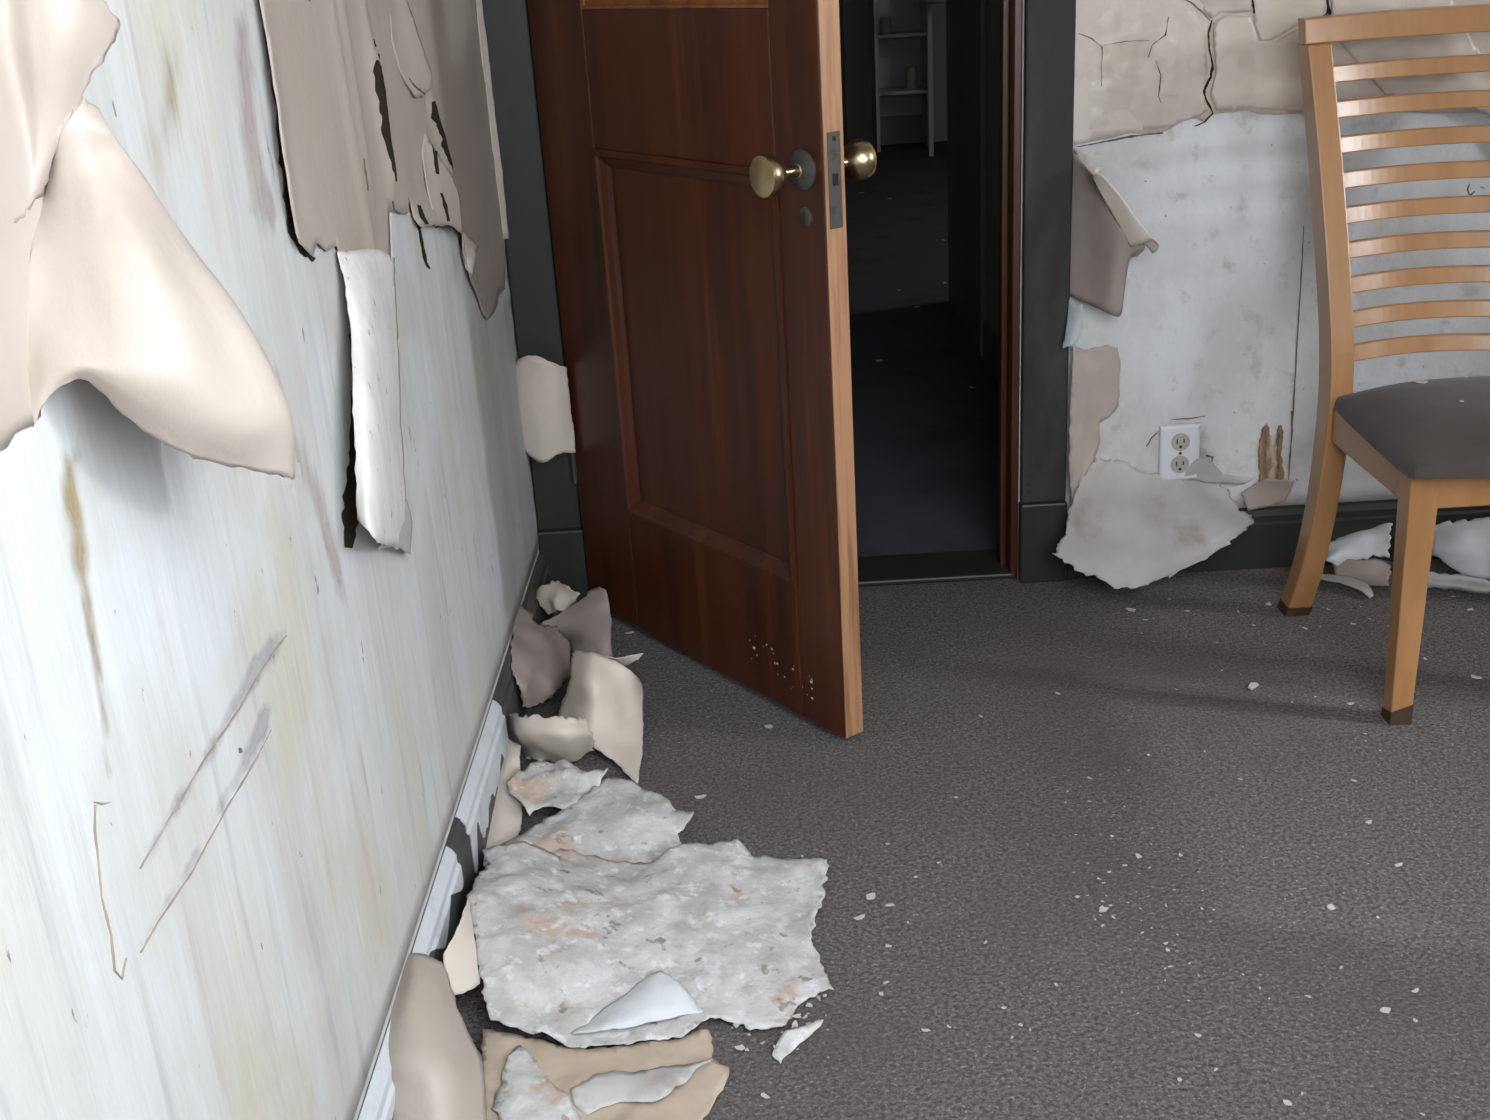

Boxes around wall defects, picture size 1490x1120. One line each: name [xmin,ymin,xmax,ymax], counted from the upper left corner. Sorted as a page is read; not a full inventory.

crack [1077,0,1214,147]
crack [1324,0,1332,15]
peeling [1065,110,1319,518]
peeling [1339,112,1490,393]
peeling [0,0,539,1120]
peeling [1339,454,1398,502]